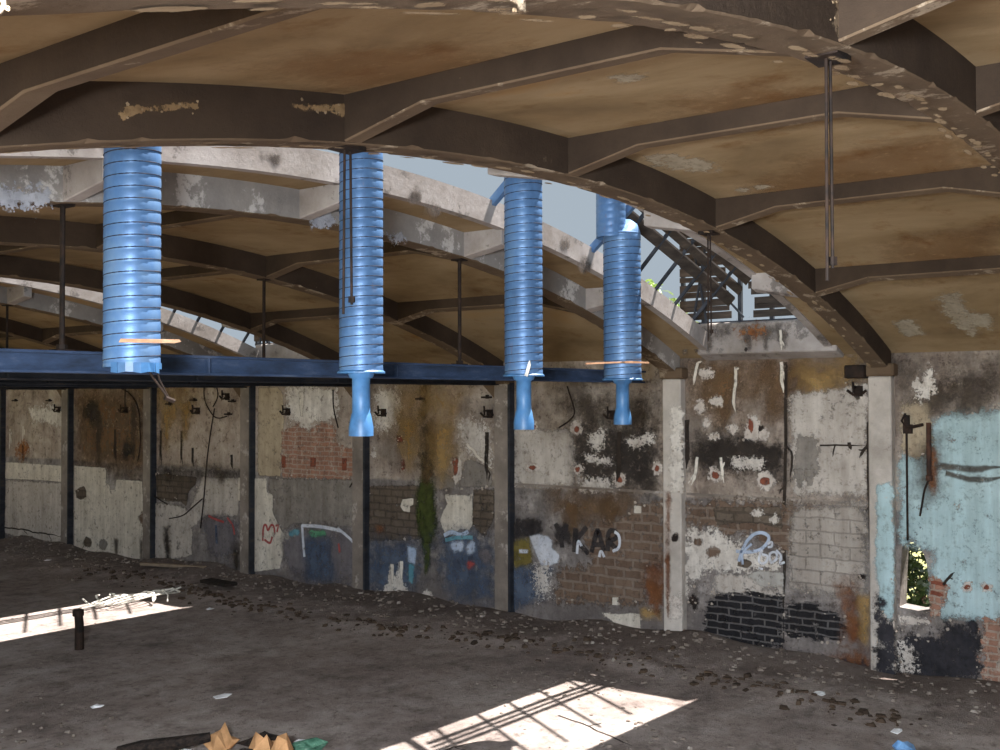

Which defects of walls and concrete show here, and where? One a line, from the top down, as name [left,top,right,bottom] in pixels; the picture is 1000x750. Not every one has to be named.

spalling [233,0,283,11]
spalling [315,2,454,15]
spalling [487,0,553,22]
spalling [610,9,715,43]
spalling [788,45,861,86]
spalling [871,83,1000,177]
peeling [0,180,53,219]
leakage [399,385,459,483]
peeling [5,462,61,542]
peeling [74,466,143,559]
peeling [155,472,240,559]
spalling [514,362,1000,682]